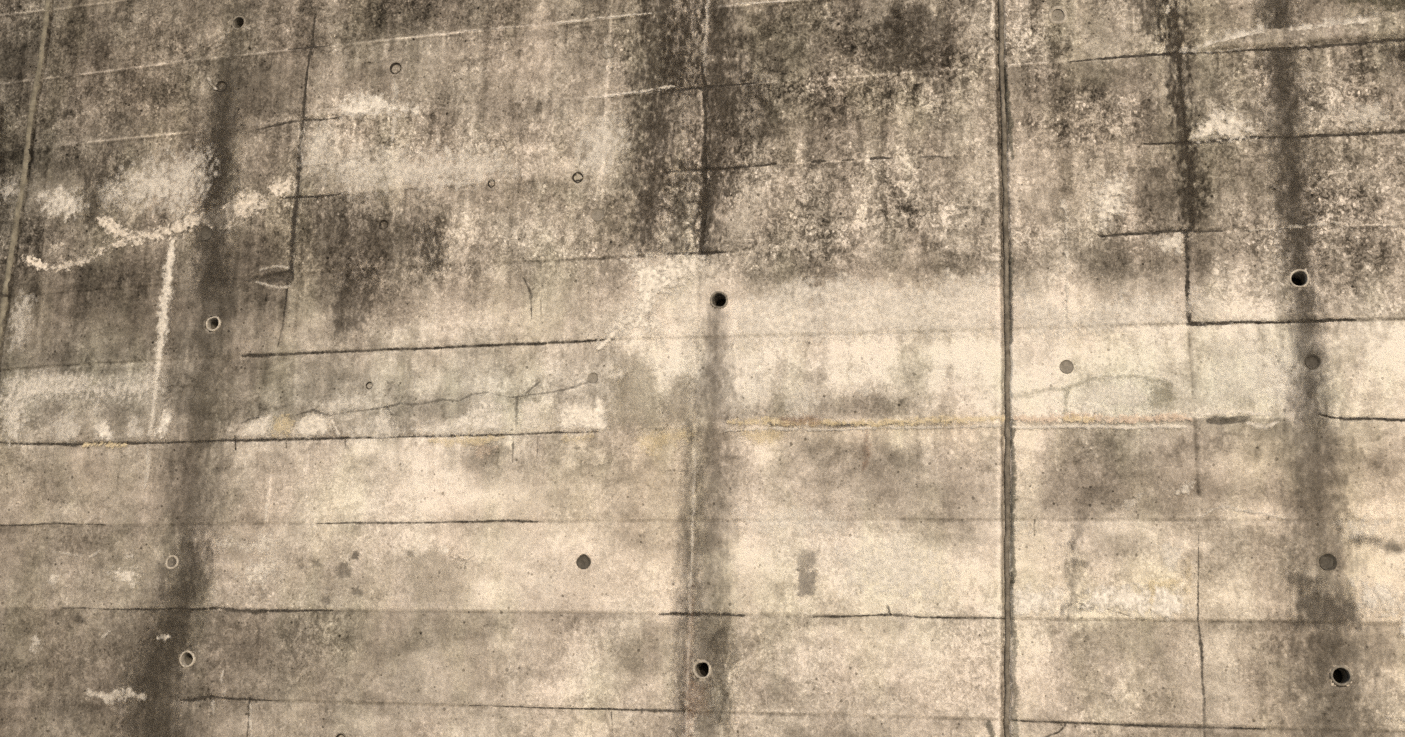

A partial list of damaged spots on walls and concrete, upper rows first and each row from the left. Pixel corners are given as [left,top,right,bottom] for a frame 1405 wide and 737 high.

leakage [1291,17,1369,31]
leakage [1151,0,1263,254]
leakage [38,186,81,220]
leakage [118,155,216,212]
leakage [557,0,787,369]
leakage [1088,174,1131,229]
leakage [1022,199,1181,335]
leakage [734,270,997,344]
leakage [115,555,135,585]
crack [1197,547,1205,705]
leakage [87,688,144,703]
crack [1015,720,1174,735]